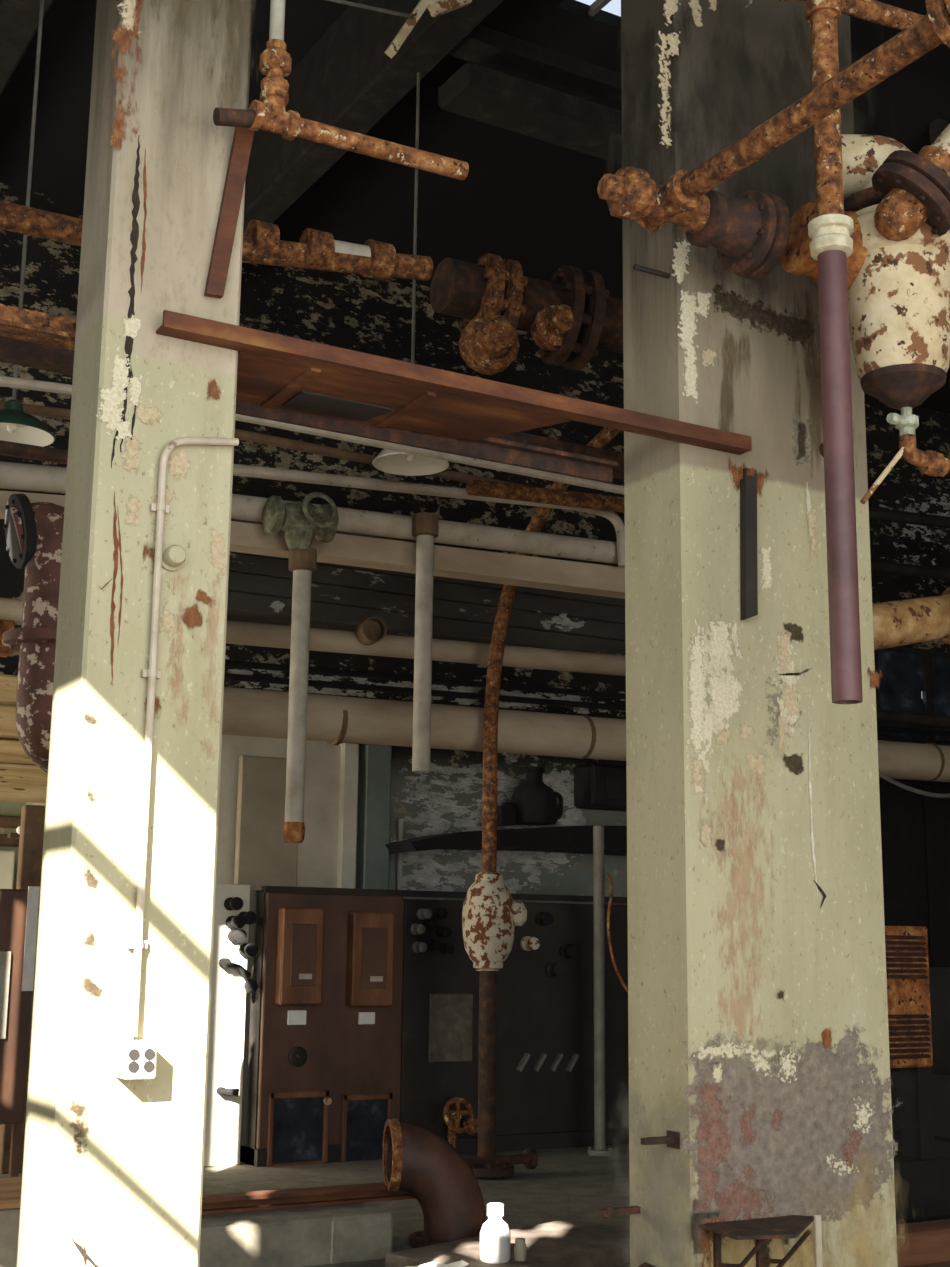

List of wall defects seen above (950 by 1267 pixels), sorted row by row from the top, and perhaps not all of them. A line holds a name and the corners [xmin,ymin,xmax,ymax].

spalling [111,0,145,149]
peeling [663,0,717,56]
peeling [96,315,162,474]
peeling [672,239,814,404]
corrosion [178,589,215,653]
peeling [760,547,773,589]
peeling [684,619,804,802]
peeling [700,821,725,851]
peeling [680,1026,898,1238]